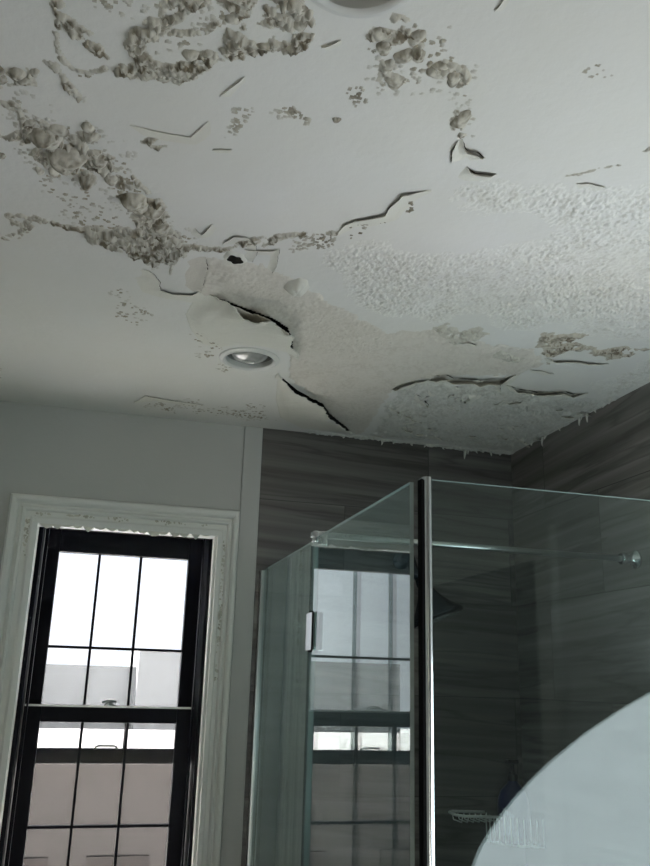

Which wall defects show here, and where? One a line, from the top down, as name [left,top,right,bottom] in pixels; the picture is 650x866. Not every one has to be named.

spalling [49,0,316,86]
crack [190,190,432,273]
flaking render [185,251,602,451]